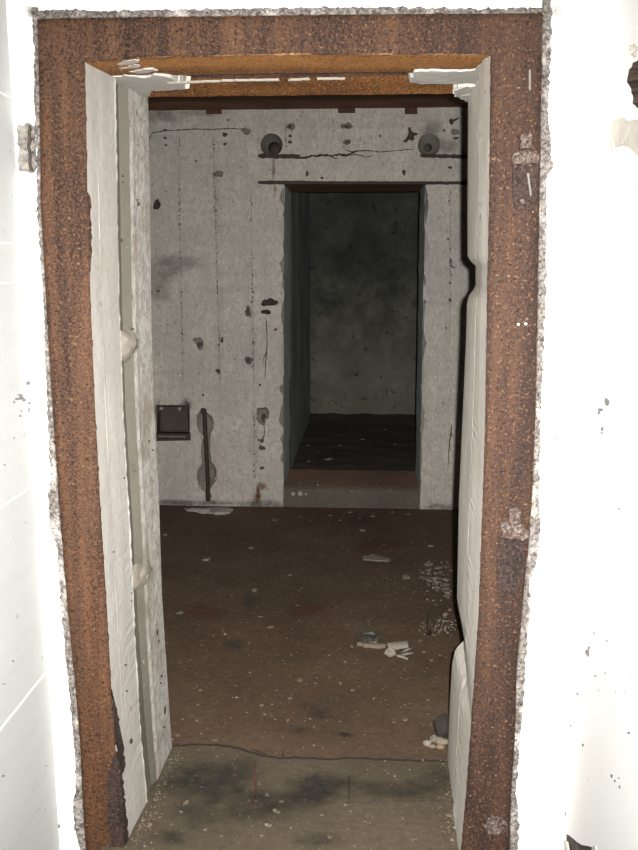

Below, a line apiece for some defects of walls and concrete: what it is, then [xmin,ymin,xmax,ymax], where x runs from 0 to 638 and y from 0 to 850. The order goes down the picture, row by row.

peeling [113,59,345,97]
crack [300,149,413,159]
spalling [180,291,203,382]
spalling [197,411,218,501]
spalling [252,407,269,479]
peeling [106,689,133,848]